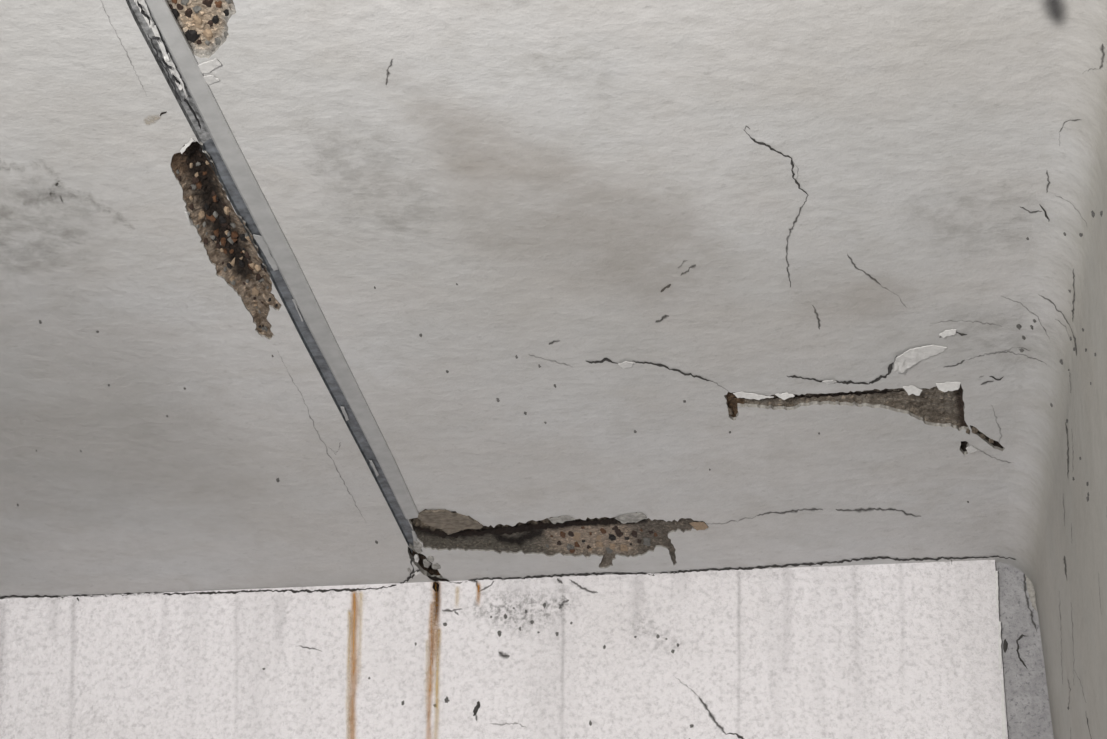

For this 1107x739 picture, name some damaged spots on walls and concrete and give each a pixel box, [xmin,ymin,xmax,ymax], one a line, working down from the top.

spalling [166,0,236,85]
spalling [171,138,303,340]
crack [744,126,808,287]
crack [586,358,722,387]
crack [787,363,893,385]
spalling [724,382,1010,463]
spalling [409,509,709,568]
crack [731,508,915,521]
corrosion [349,593,357,678]
corrosion [407,531,449,705]
crack [686,685,744,739]